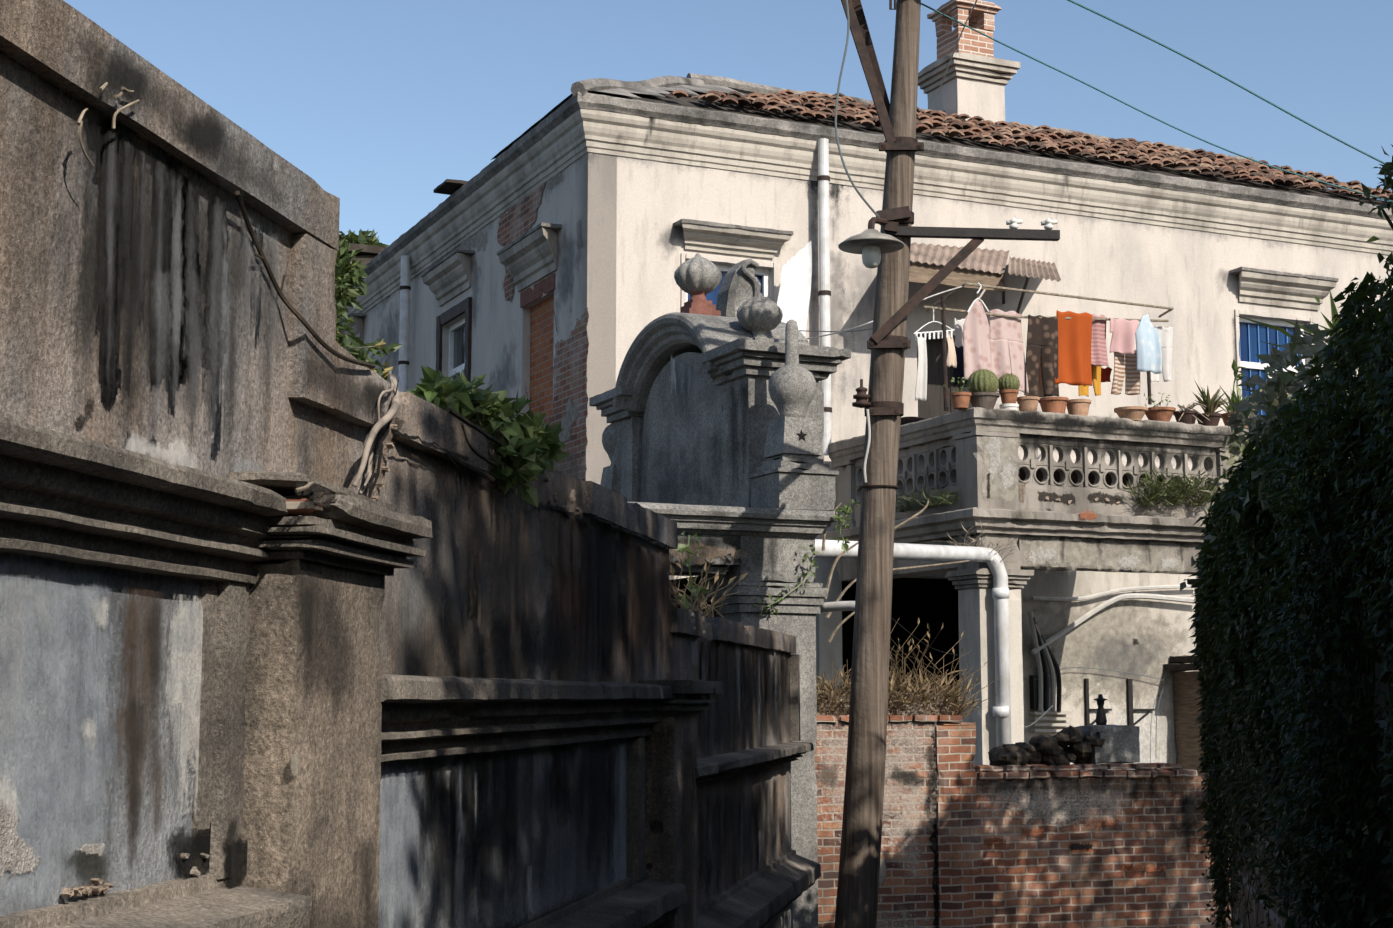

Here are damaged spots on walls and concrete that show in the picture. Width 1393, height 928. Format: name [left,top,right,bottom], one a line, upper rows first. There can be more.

water stain [84,157,243,403]
spalling [502,266,516,302]
spalling [497,172,562,247]
spalling [472,308,589,524]
water stain [398,554,572,681]
peeling [0,555,119,906]
water stain [224,819,248,888]
water stain [420,745,616,913]
water stain [684,641,788,916]